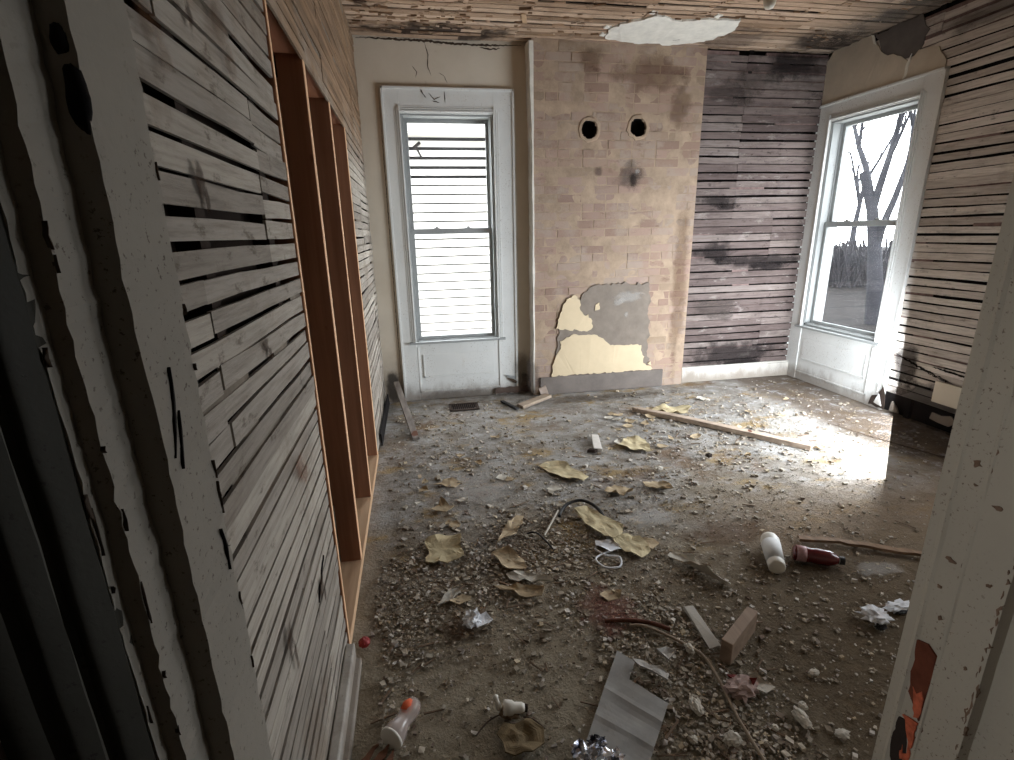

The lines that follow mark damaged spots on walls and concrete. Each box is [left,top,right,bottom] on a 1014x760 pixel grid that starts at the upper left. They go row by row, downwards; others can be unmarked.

crack [355,37,521,103]
peeling [41,221,61,273]
flaking render [551,295,652,377]
peeling [211,460,225,513]
peeling [890,639,937,760]
peeling [955,566,1014,759]